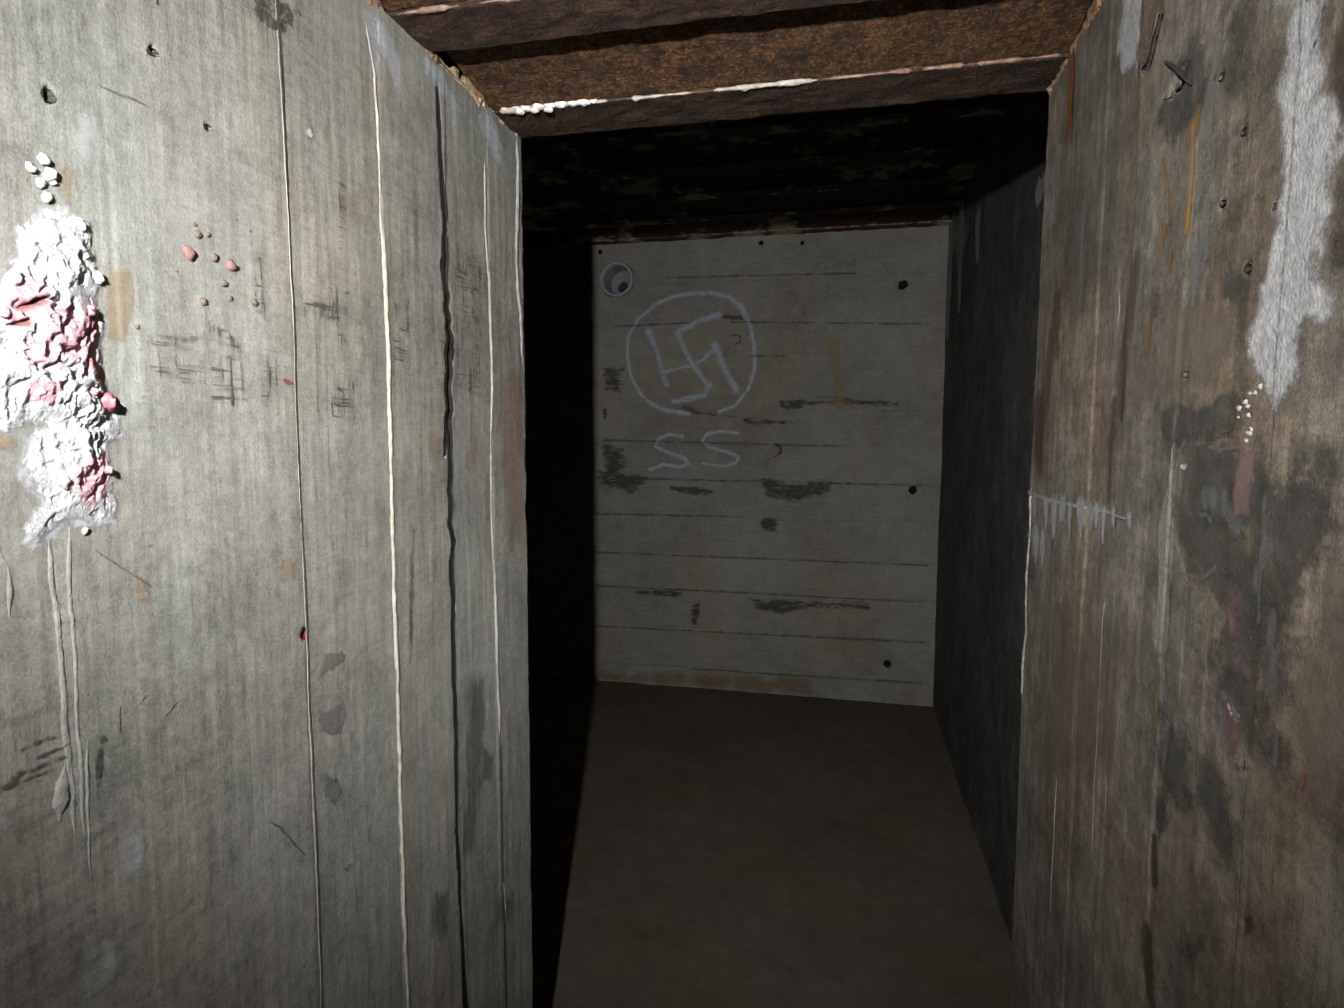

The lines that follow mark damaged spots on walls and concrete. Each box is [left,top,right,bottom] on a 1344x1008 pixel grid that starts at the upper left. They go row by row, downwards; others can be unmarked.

water stain [364,10,402,94]
efflorescence [399,4,459,14]
water stain [424,57,461,113]
corrosion [1065,47,1075,144]
water stain [1135,0,1344,887]
crack [436,87,469,1008]
crack [500,742,508,1008]
water stain [1141,922,1155,1008]